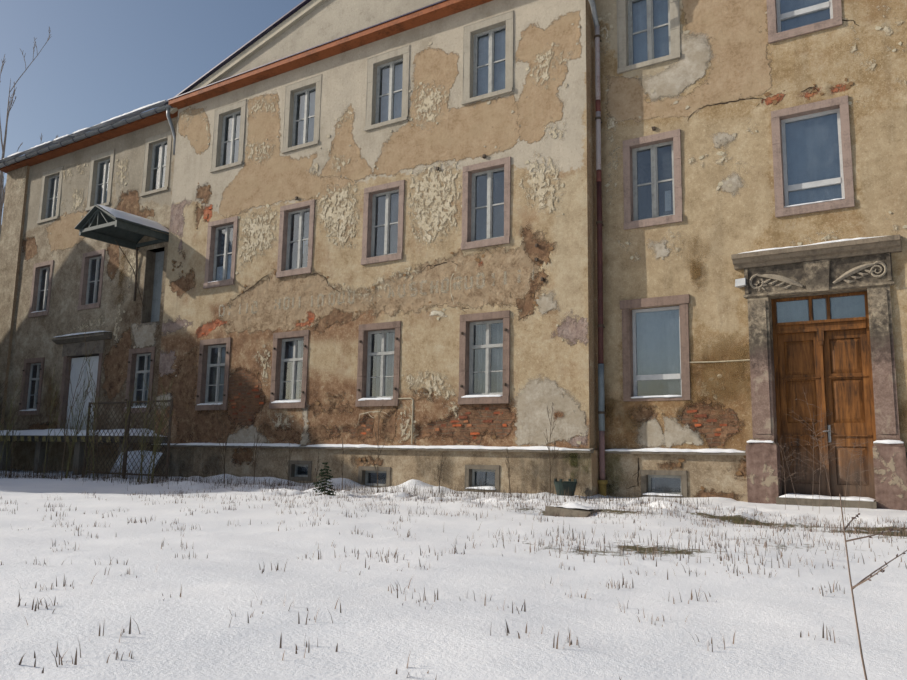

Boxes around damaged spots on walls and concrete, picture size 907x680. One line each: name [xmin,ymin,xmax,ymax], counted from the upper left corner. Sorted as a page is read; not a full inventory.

crack [688,97,764,119]
flaking render [803,78,853,98]
peeling [169,11,582,298]
crack [421,257,469,312]
flaking render [157,227,554,445]
peeling [552,312,588,346]
flaking render [626,405,665,427]
flaking render [677,381,744,449]